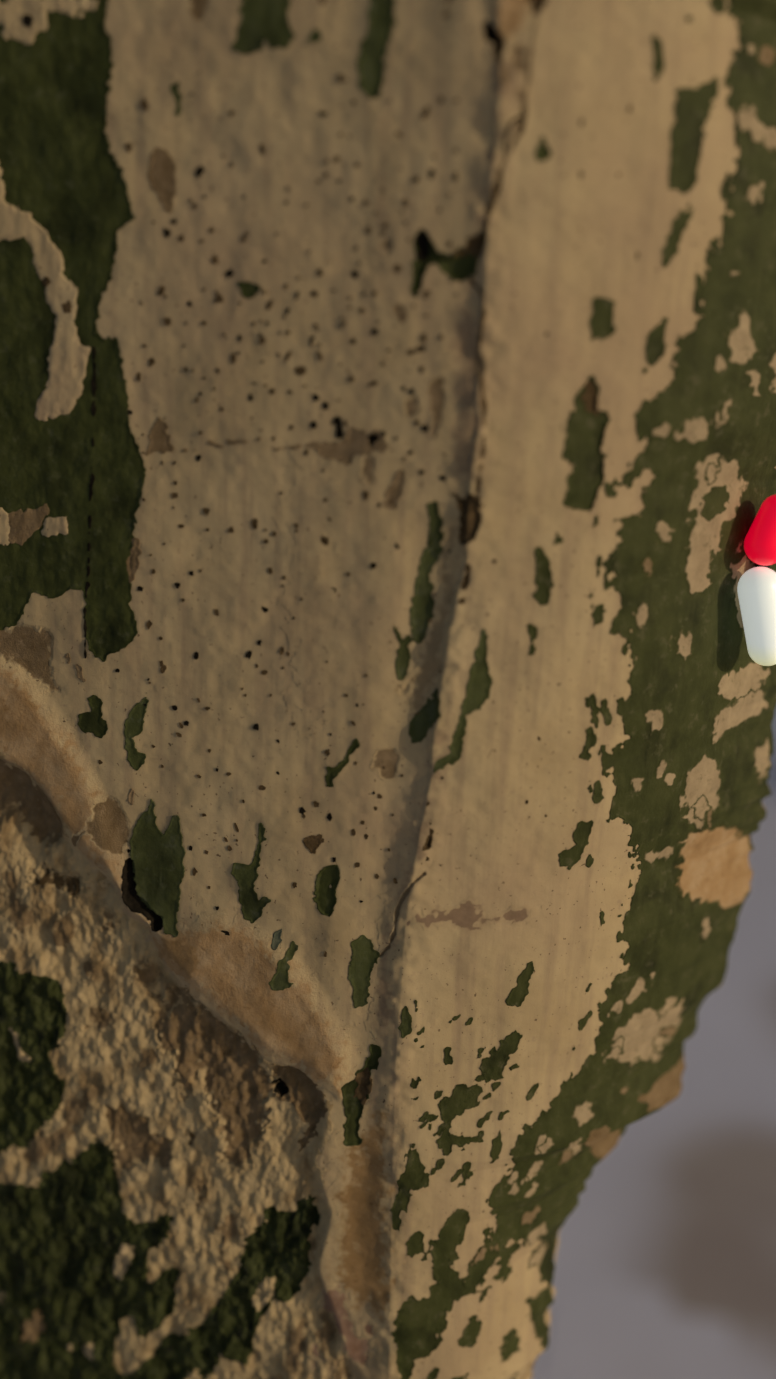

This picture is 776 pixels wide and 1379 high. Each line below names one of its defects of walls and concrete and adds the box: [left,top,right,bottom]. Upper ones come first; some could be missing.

peeling [170,82,182,117]
peeling [231,0,322,55]
crack [483,9,541,234]
peeling [0,0,176,771]
peeling [147,147,335,441]
peeling [354,222,487,456]
crack [469,277,488,493]
spalling [245,640,290,675]
flaking render [324,450,484,840]
peeling [390,0,776,1379]
crack [379,871,427,959]
flaking render [0,752,381,1379]